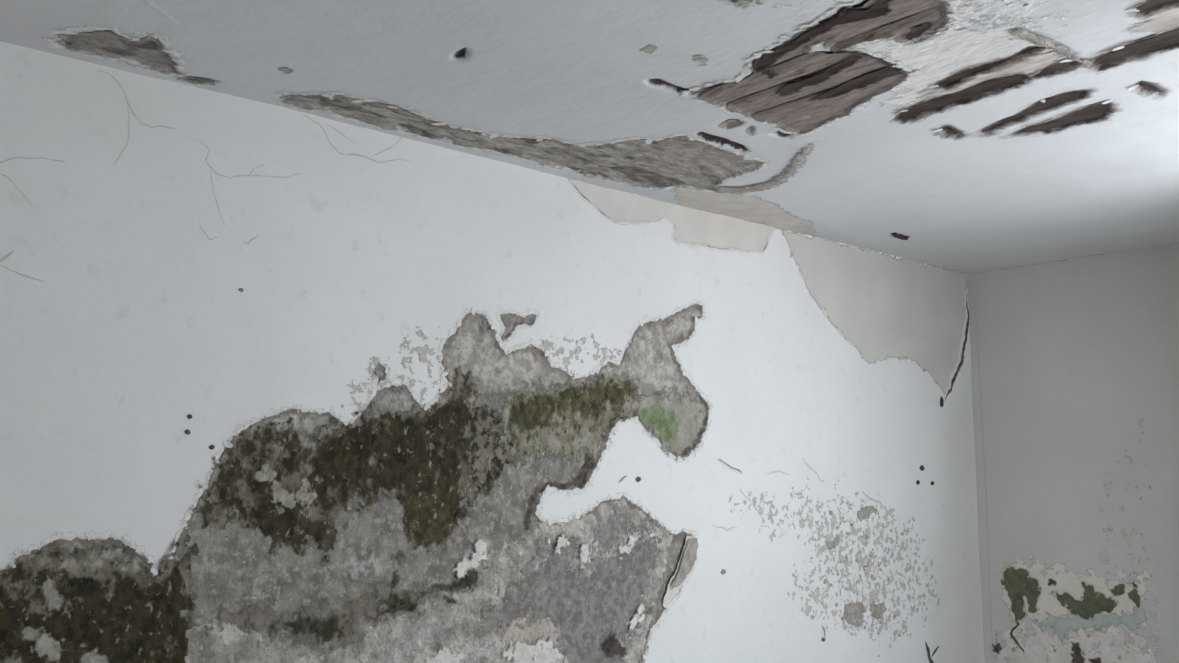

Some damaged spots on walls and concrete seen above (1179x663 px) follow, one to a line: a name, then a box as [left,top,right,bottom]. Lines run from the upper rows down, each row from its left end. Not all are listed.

flaking render [680,0,1179,140]
crack [940,289,969,407]
leakage [0,327,644,663]
peeling [990,555,1164,663]